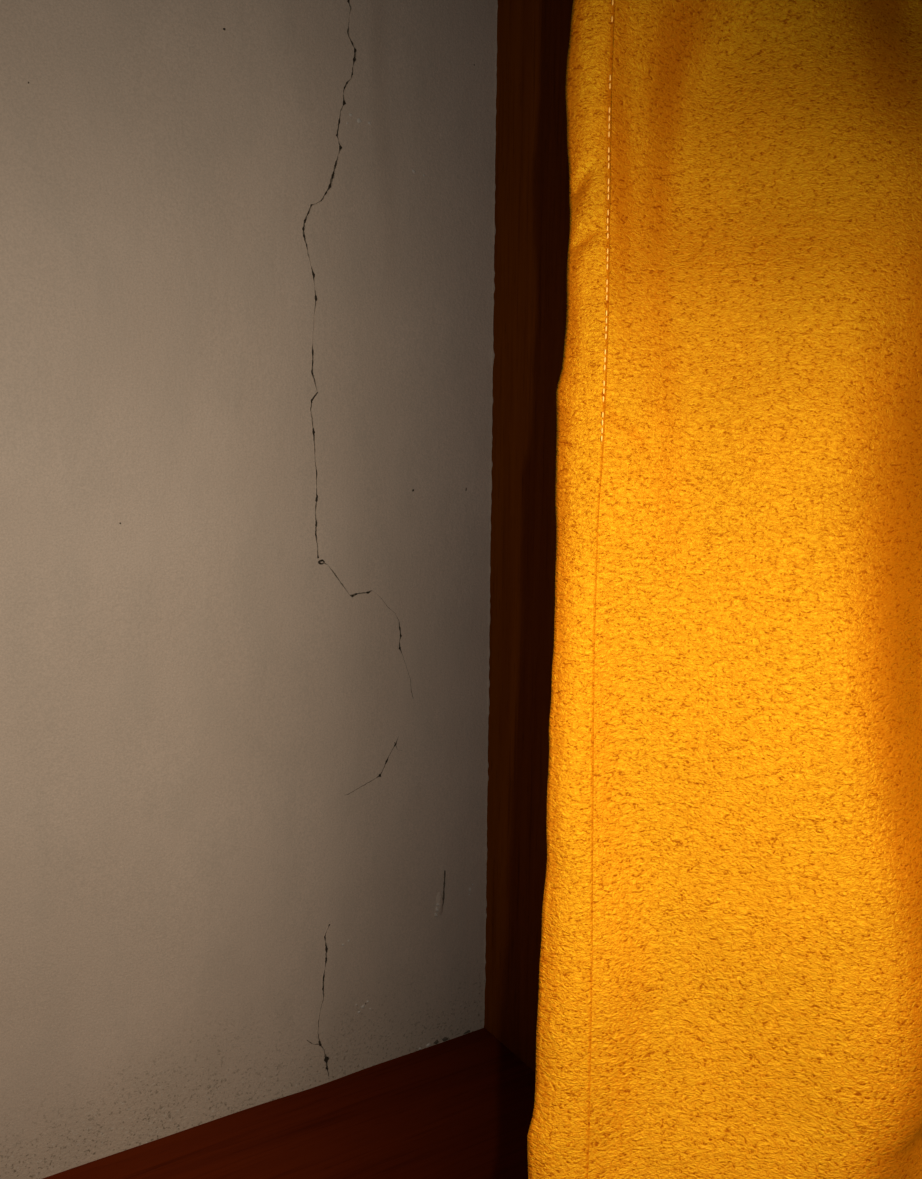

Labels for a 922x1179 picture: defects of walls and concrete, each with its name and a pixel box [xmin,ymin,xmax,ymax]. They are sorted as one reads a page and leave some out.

crack [301,0,413,697]
crack [347,736,402,795]
crack [307,924,330,1076]